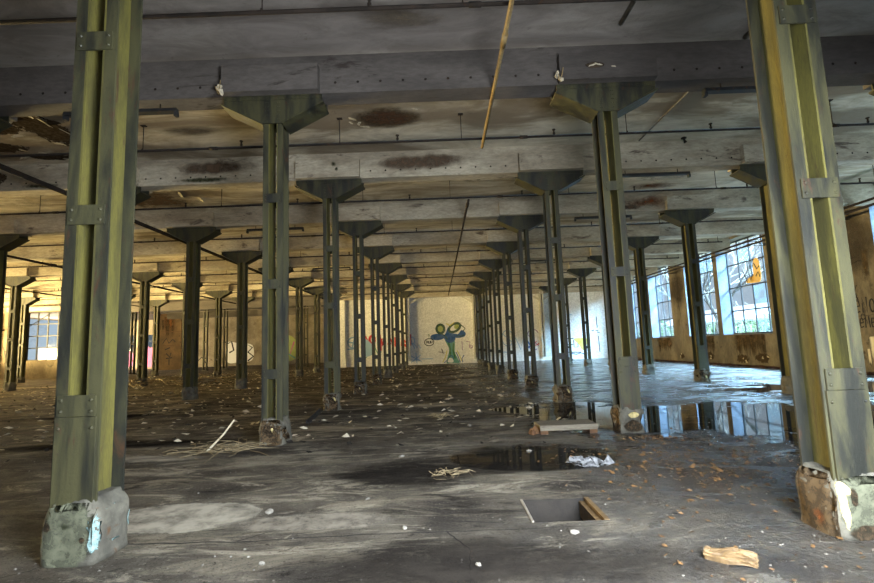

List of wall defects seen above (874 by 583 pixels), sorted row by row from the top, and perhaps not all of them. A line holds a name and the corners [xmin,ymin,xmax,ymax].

damp [348,108,418,128]
peeling [0,116,70,160]
damp [385,155,459,168]
damp [658,338,672,350]
damp [734,332,766,354]
spalling [834,481,858,530]
spalling [86,508,119,554]